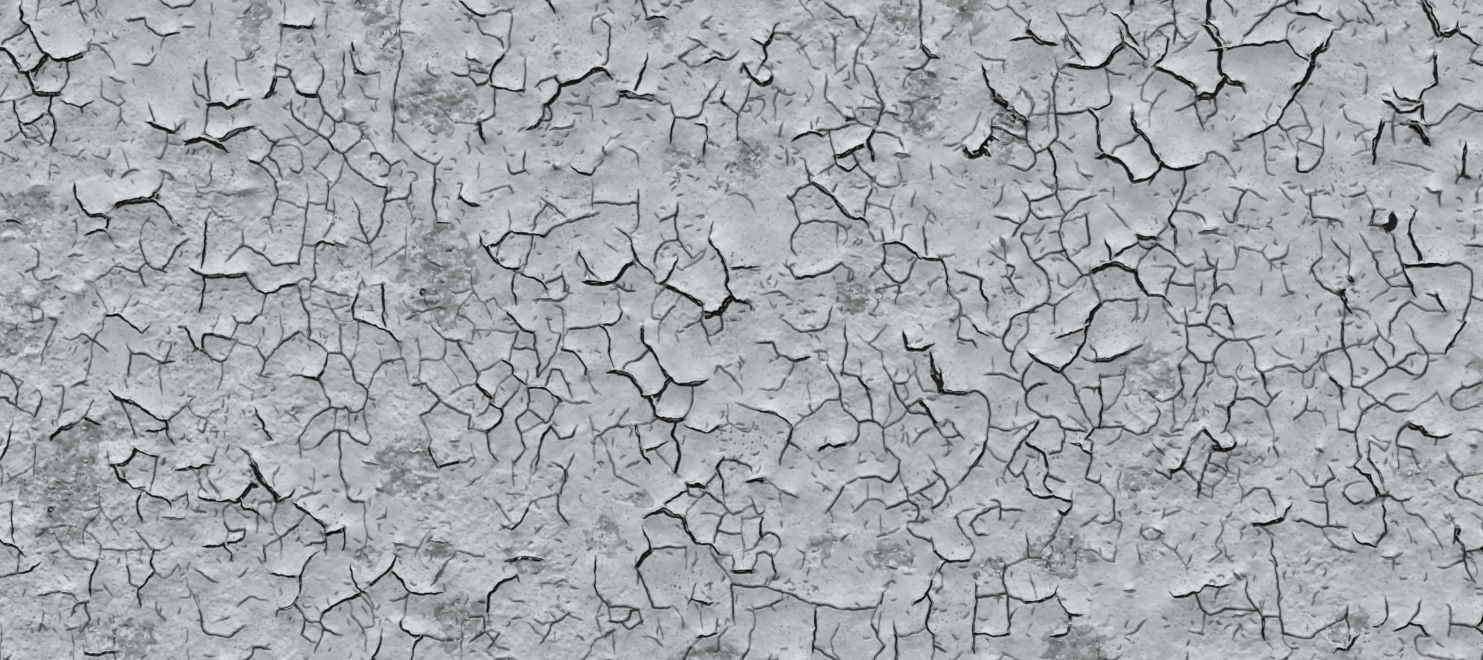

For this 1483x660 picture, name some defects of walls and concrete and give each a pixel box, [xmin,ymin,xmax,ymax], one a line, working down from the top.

crack [0,0,139,185]
crack [125,0,196,66]
crack [380,0,530,231]
crack [895,0,953,89]
crack [0,246,66,365]
crack [0,371,42,485]
crack [50,291,151,441]
crack [242,387,275,448]
crack [1137,508,1192,572]
crack [1440,453,1483,529]
crack [528,579,583,646]
crack [578,548,644,660]